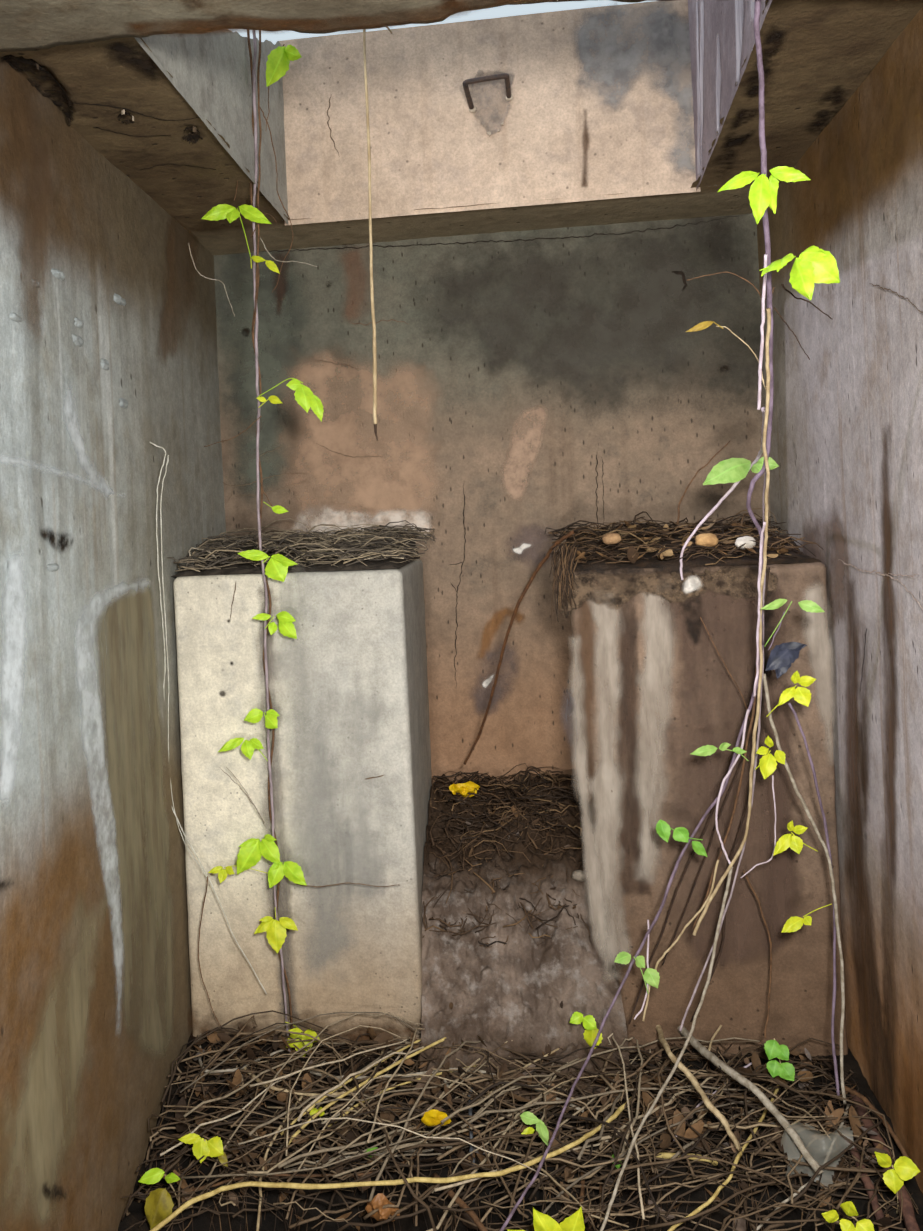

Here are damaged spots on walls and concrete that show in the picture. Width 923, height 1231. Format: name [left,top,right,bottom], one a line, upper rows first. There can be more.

spalling [1,55,73,126]
damp [108,0,537,79]
damp [577,0,784,173]
damp [809,87,843,131]
crack [450,485,466,694]
damp [562,562,797,977]